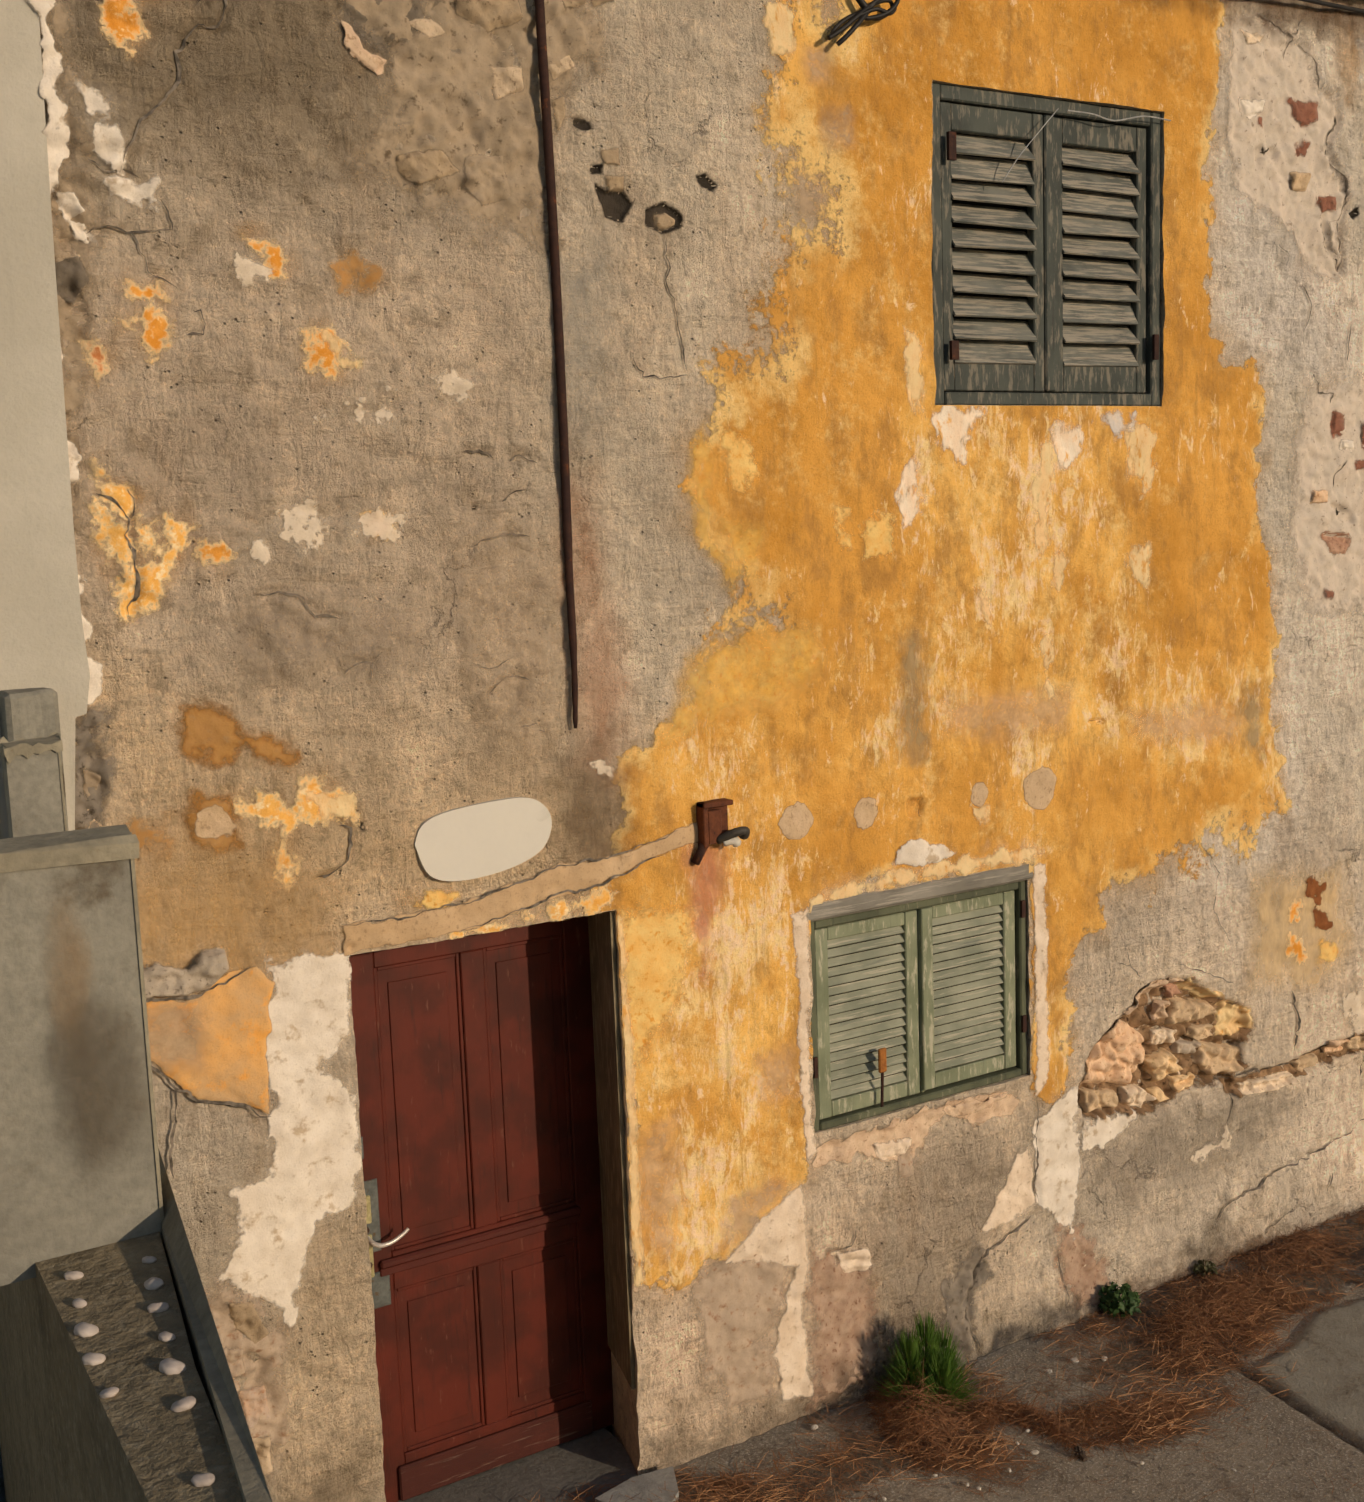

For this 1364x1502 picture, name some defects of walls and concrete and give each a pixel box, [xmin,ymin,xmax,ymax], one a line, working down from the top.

crack [83,0,228,335]
spalling [327,0,614,252]
spalling [51,0,328,622]
peeling [345,386,397,424]
spalling [75,708,115,830]
peeling [128,705,360,891]
crack [342,832,673,931]
peeling [449,0,1364,1414]
crack [1195,992,1364,1127]
peeling [146,951,362,1477]
crack [1204,1119,1364,1238]